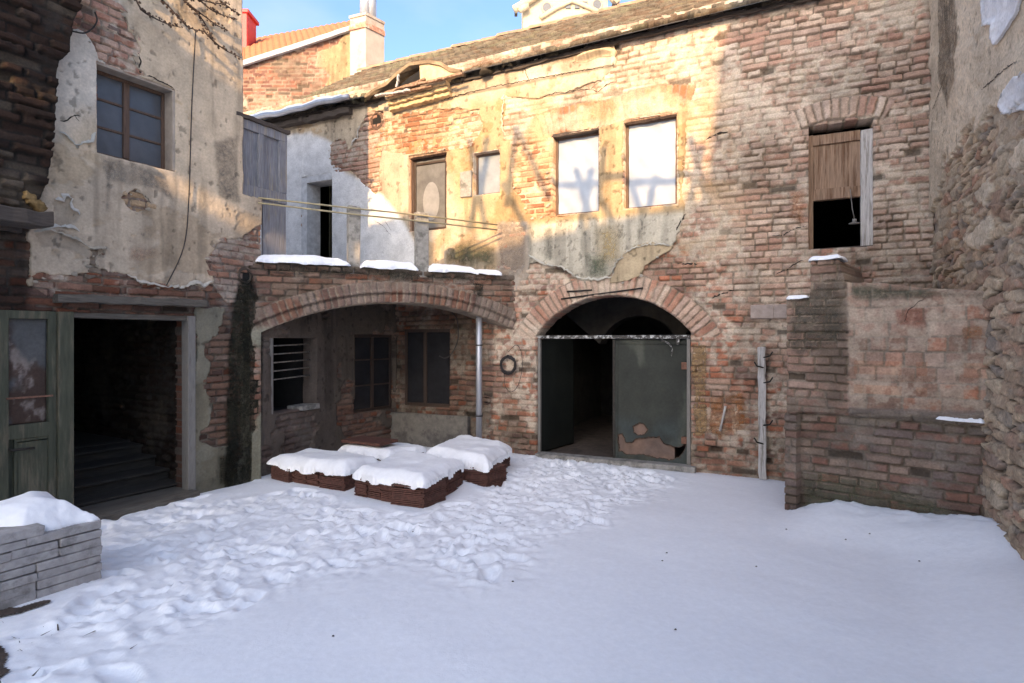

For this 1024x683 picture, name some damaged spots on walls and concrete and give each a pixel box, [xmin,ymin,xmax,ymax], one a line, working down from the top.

peeling [980,0,1022,45]
peeling [997,70,1024,115]
flaking render [328,107,483,194]
flaking render [28,193,261,303]
flaking render [529,242,674,284]
flaking render [199,315,242,449]